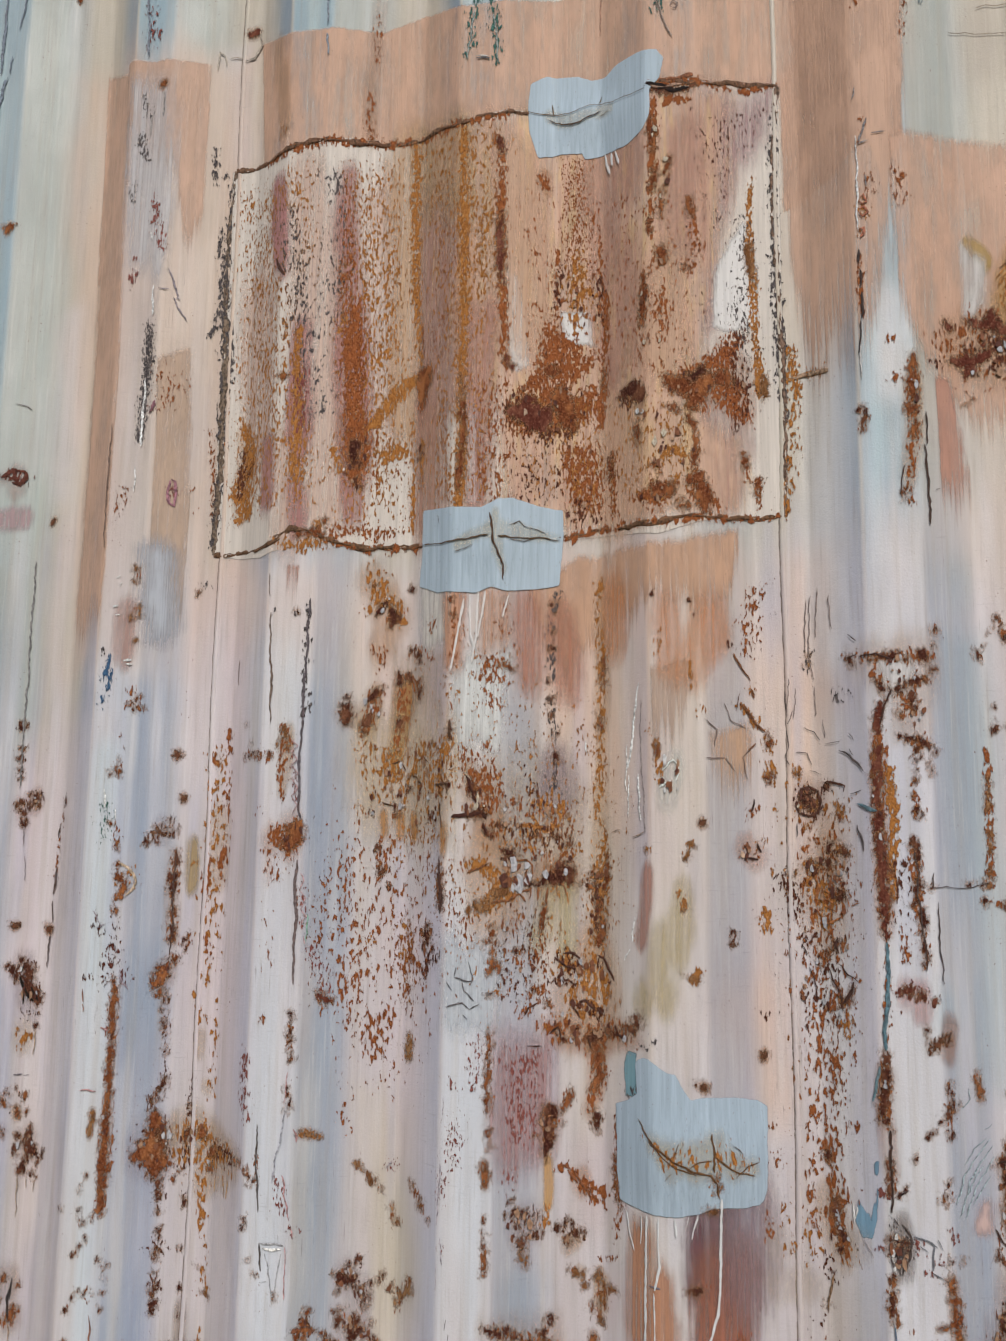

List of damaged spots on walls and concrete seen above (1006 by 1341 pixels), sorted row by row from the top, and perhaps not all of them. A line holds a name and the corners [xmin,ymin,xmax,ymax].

rust [190,75,1006,1341]
rust [62,1287,104,1341]
rust [70,717,297,1332]